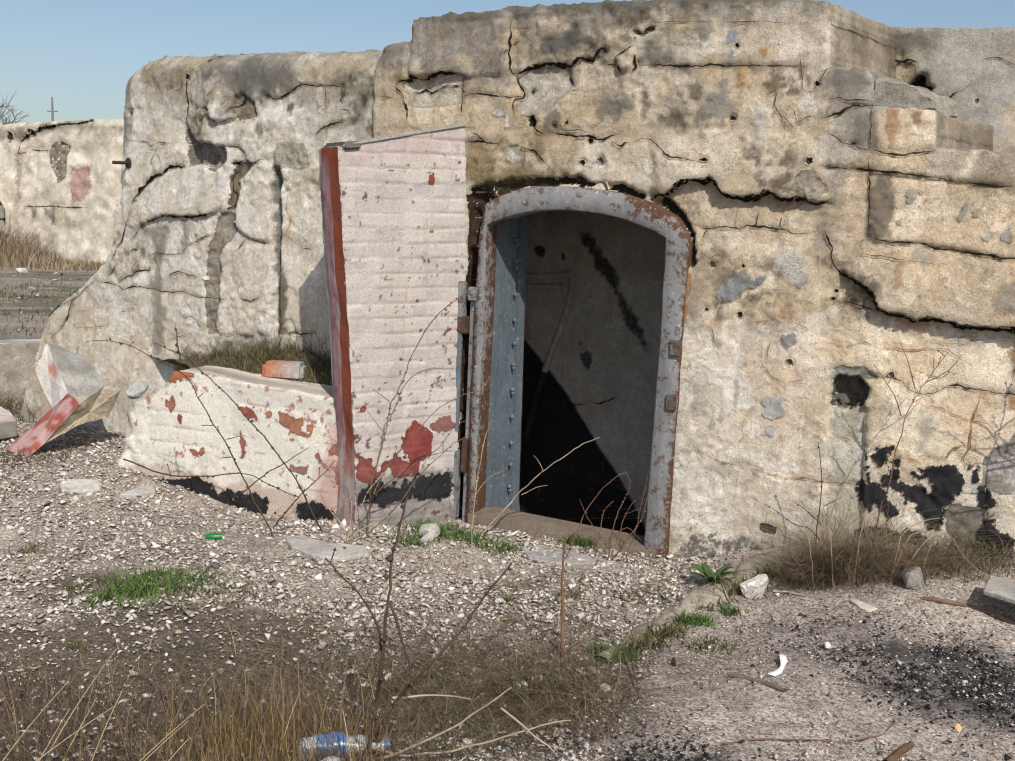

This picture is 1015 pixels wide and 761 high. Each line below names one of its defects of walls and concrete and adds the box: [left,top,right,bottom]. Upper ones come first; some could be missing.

crack [28,205,82,222]
crack [18,119,94,154]
spalling [49,141,71,183]
crack [43,56,351,339]
water stain [271,165,288,334]
crack [383,17,1015,468]
peeling [237,406,313,459]
spalling [262,360,308,381]
peeling [355,334,469,485]
crack [710,407,857,486]
peeling [296,499,336,522]
peeling [855,434,1015,560]